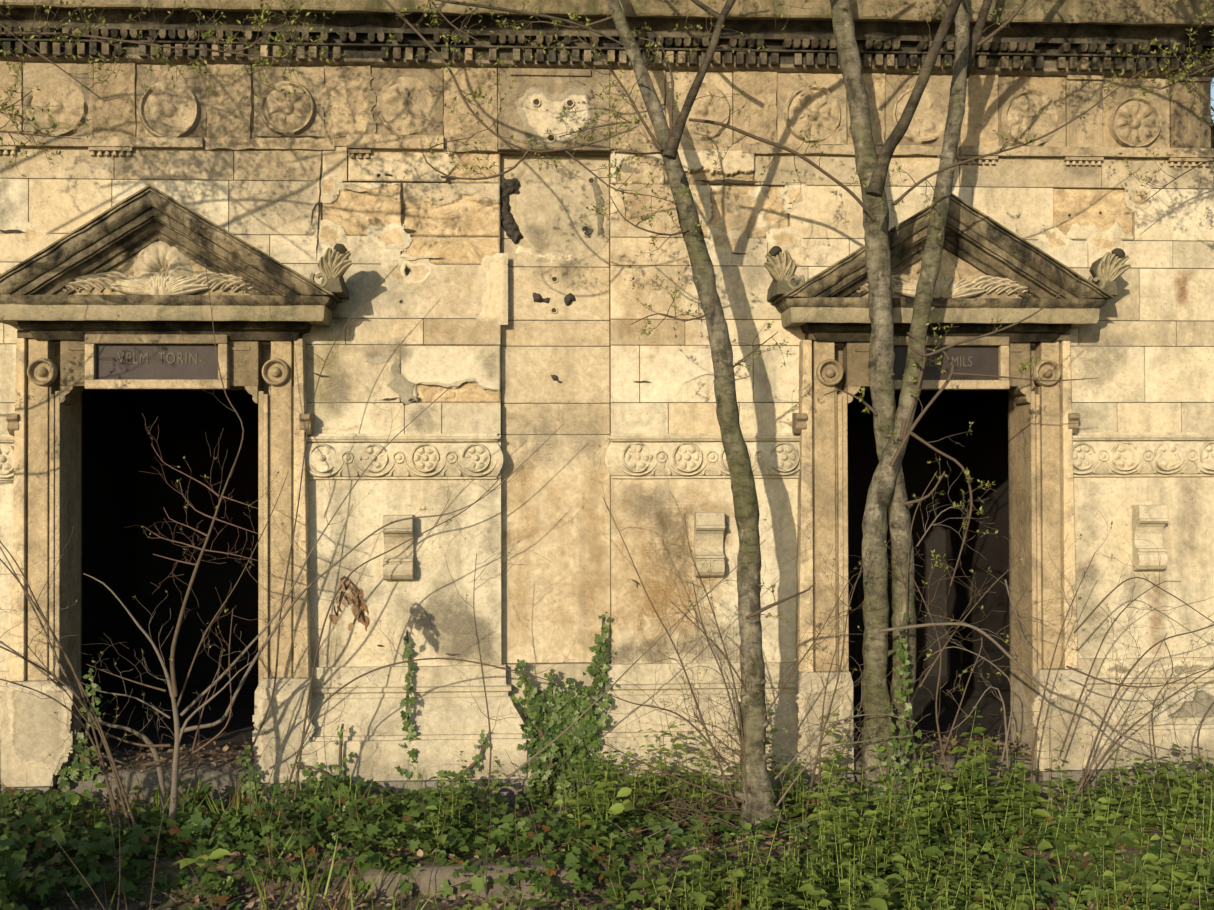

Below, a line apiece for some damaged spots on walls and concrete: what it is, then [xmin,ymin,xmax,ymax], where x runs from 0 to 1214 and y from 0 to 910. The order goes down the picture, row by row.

spalling [319,71,376,140]
spalling [514,87,595,147]
spalling [313,148,508,325]
spalling [611,150,669,184]
spalling [678,150,808,253]
spalling [1038,183,1152,254]
spalling [366,346,500,408]